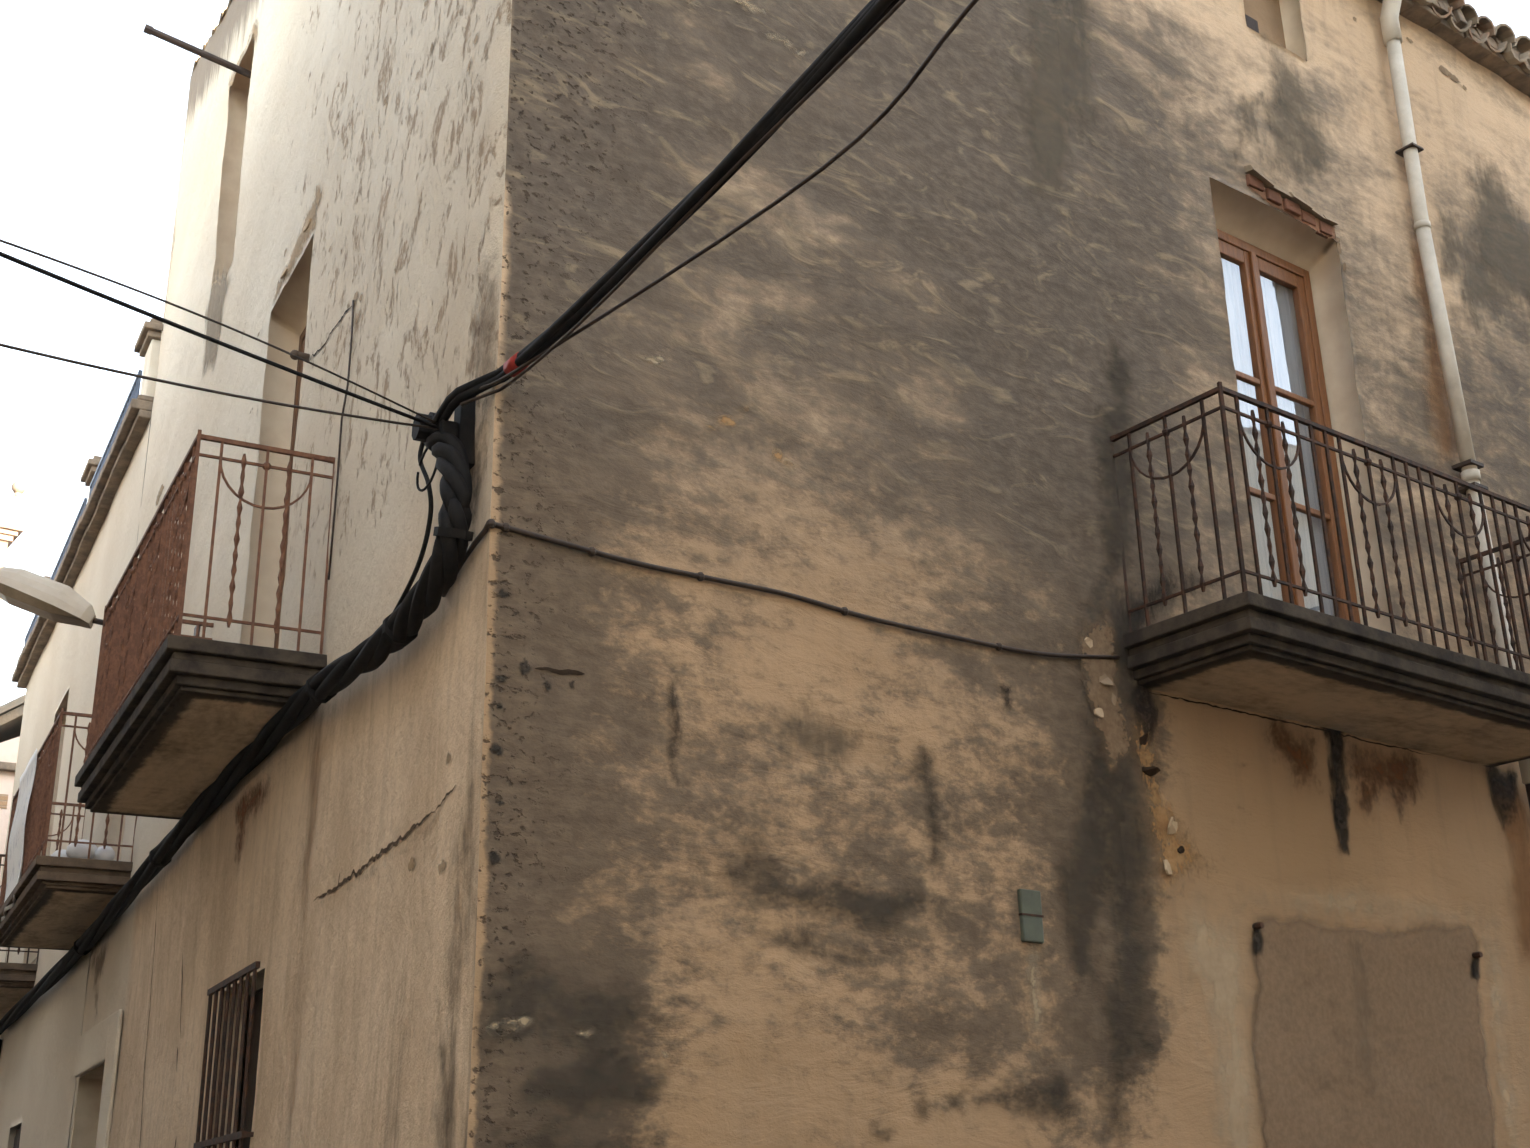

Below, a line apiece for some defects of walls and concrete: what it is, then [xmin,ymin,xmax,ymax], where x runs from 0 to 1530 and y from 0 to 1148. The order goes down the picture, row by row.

spalling [1244,165,1338,239]
leakage [1097,348,1136,565]
crack [313,785,456,902]
leakage [730,852,816,900]
leakage [840,892,921,924]
leakage [1062,723,1147,1122]
flaking render [1080,610,1197,876]
leakage [1323,727,1350,854]
leakage [489,962,664,1102]